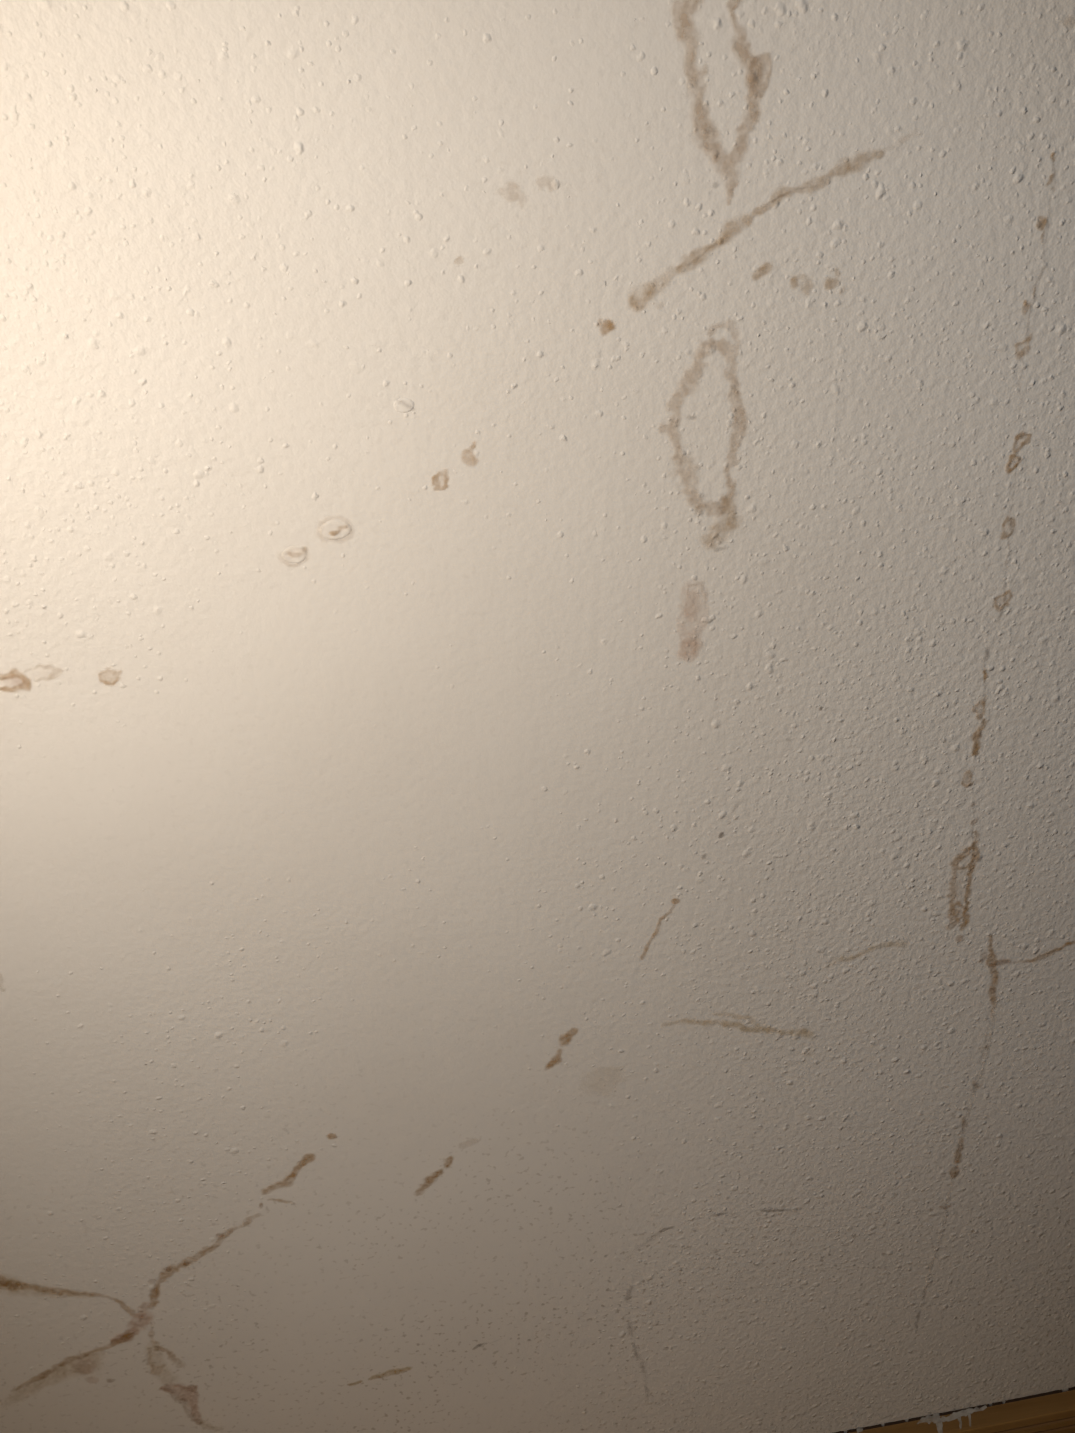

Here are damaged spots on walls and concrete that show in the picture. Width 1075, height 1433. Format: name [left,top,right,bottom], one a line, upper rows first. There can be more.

crack [547,1034,571,1067]
crack [287,1136,331,1178]
crack [121,1288,158,1338]